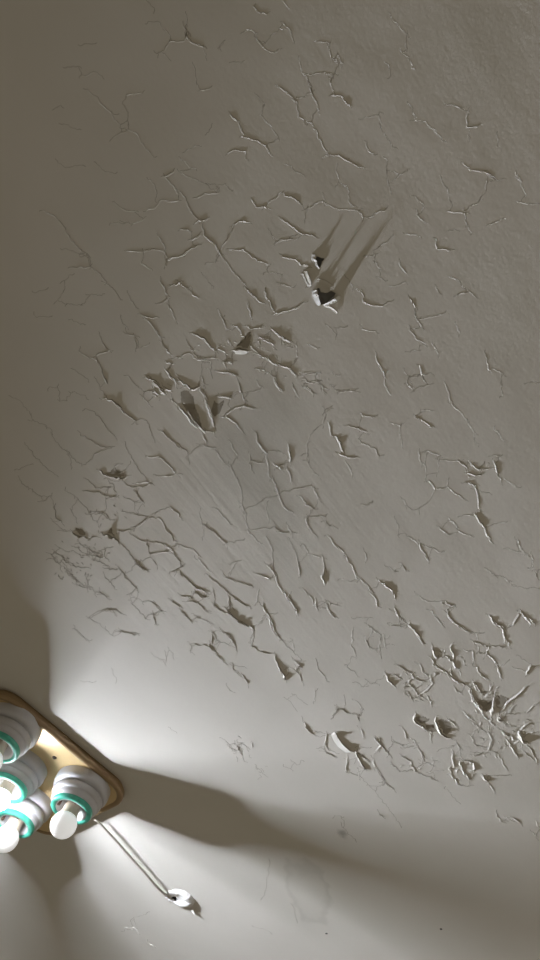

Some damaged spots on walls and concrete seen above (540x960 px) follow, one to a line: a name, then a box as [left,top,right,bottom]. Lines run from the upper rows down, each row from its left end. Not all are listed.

crack [63,0,540,447]
spalling [124,287,309,485]
crack [9,210,540,828]
peeling [301,716,351,758]
spalling [352,620,540,804]